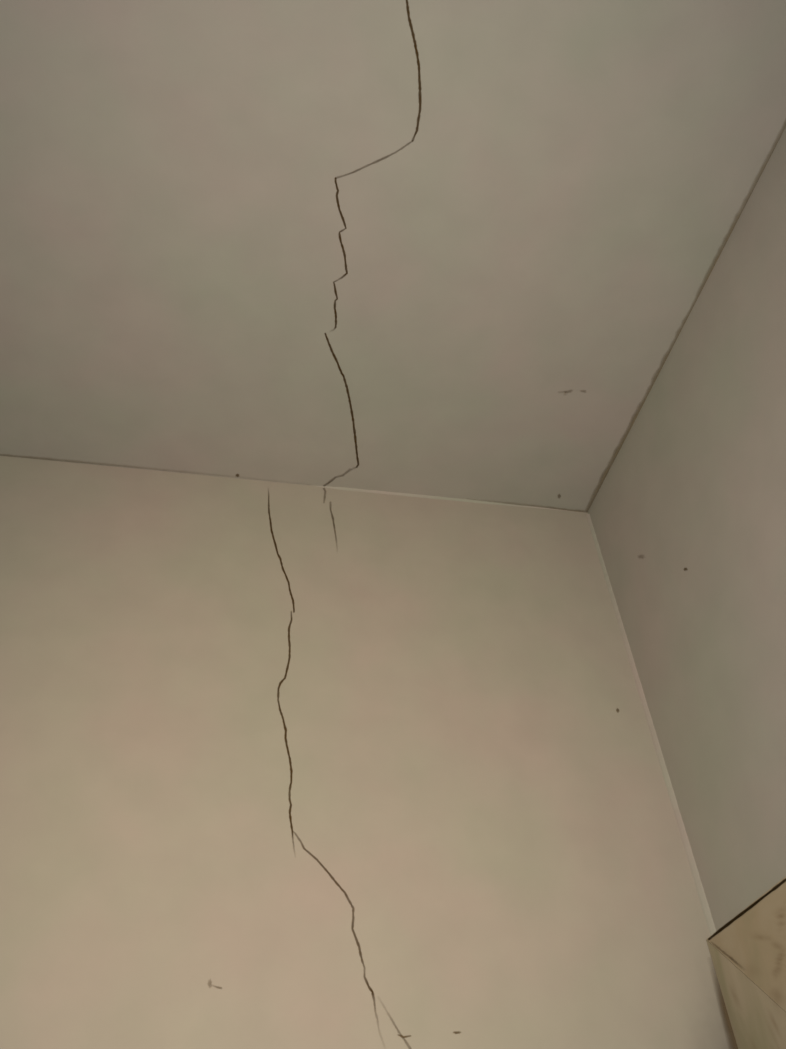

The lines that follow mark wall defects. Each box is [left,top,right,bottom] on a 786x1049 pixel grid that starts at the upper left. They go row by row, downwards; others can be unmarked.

crack [406,0,421,141]
crack [325,178,359,467]
crack [268,499,374,998]